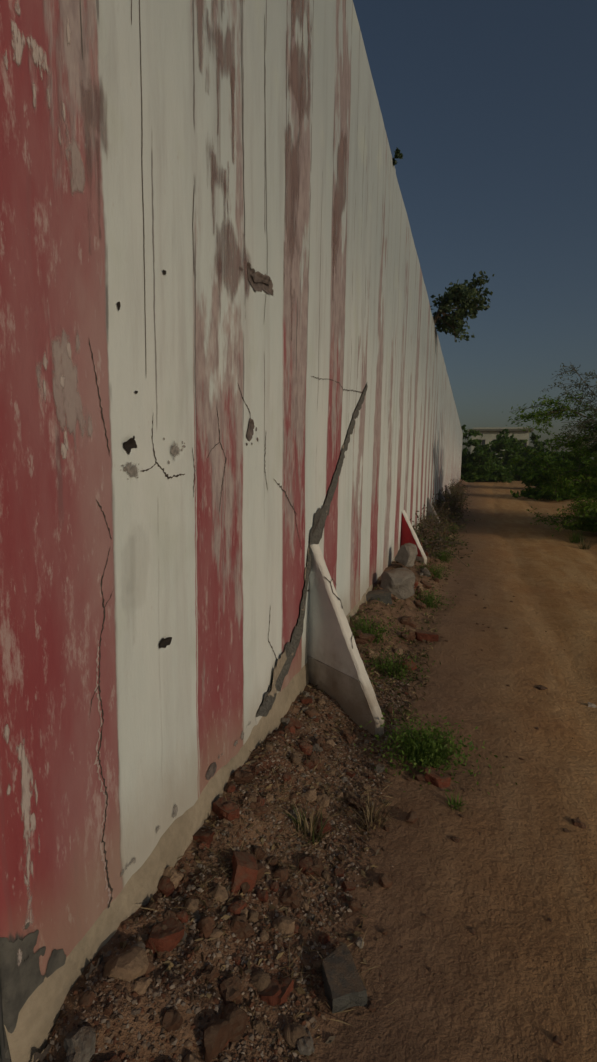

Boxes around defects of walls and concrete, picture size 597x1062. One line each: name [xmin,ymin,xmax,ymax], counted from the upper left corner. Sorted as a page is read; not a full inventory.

peeling [4,0,66,120]
peeling [58,132,86,192]
spalling [239,263,274,295]
crack [142,405,227,511]
spalling [246,418,258,446]
crack [237,376,368,717]
crack [89,501,113,909]
flaking render [0,724,66,1059]